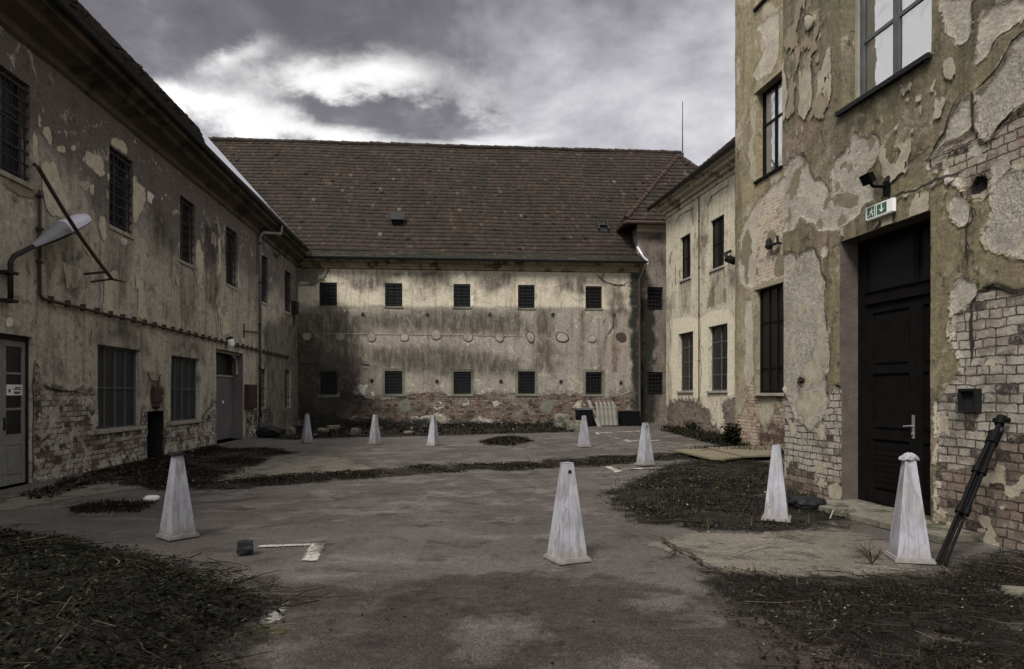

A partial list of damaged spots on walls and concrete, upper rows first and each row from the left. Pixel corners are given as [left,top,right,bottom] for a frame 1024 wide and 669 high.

peeling [3,115,109,219]
peeling [111,138,136,154]
peeling [133,176,163,223]
flaking render [666,0,914,500]
flaking render [901,0,1024,260]
flaking render [33,361,165,483]
water stain [263,310,553,428]